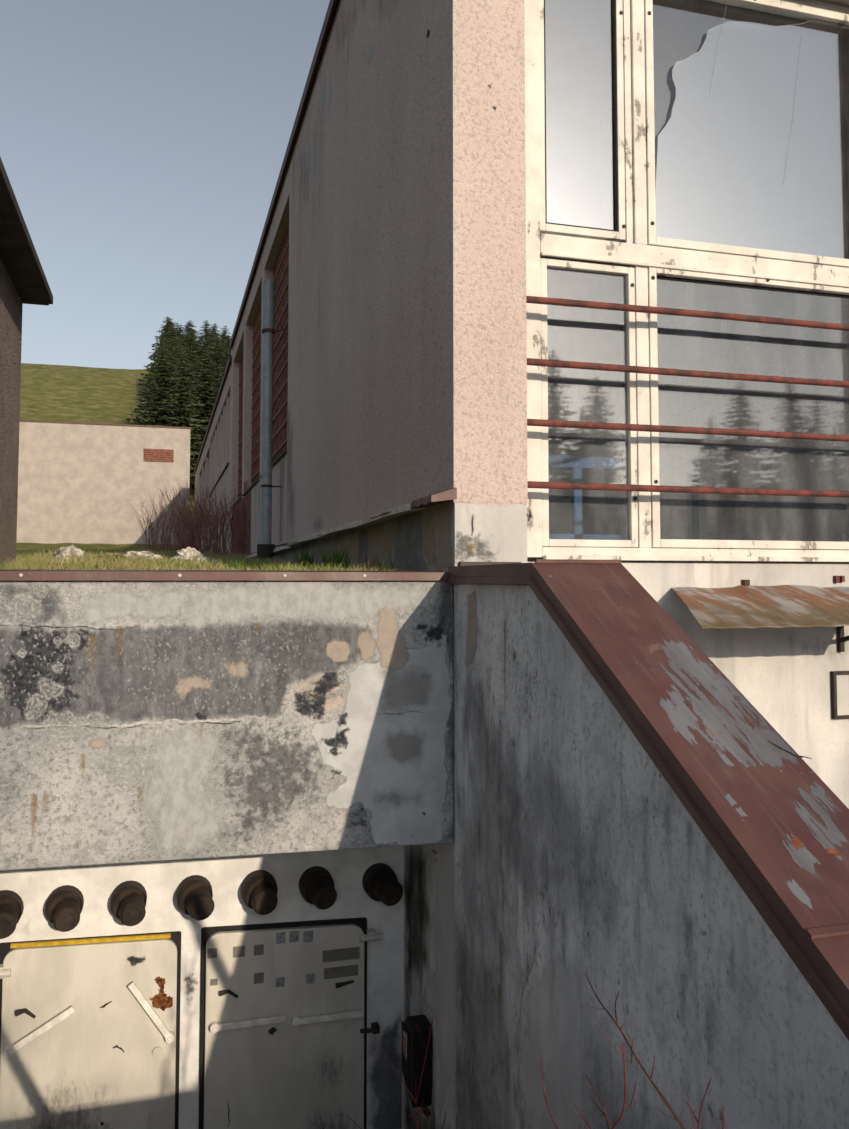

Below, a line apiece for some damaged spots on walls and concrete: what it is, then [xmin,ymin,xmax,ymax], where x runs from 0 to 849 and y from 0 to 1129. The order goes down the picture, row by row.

peeling [465,592,477,664]
peeling [176,676,213,698]
peeling [226,661,247,678]
peeling [274,607,452,854]
peeling [650,639,799,769]
peeling [781,780,849,909]
rust [150,976,173,1011]